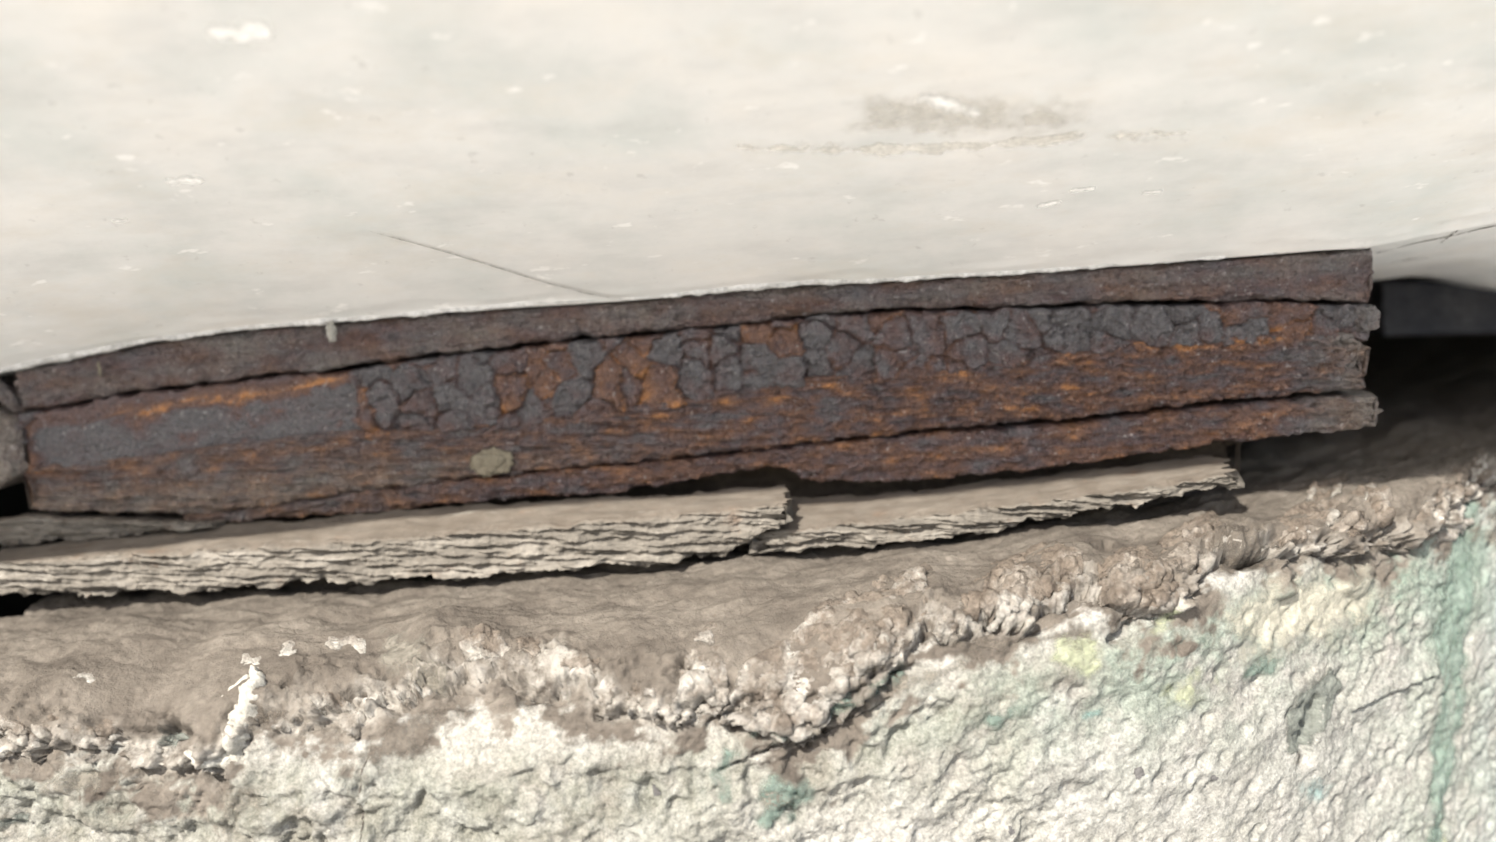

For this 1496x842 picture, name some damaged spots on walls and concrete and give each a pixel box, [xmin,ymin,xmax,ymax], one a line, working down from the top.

corrosion [0,373,43,414]
corrosion [0,455,1245,598]
spalling [961,504,1222,633]
damp [1428,501,1496,842]